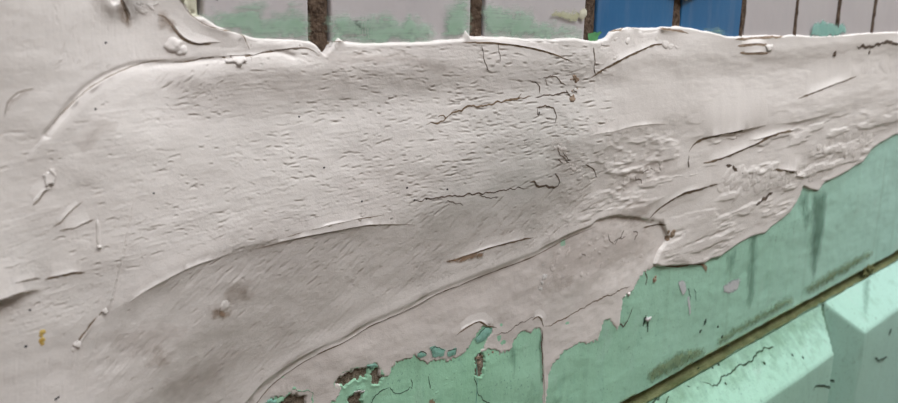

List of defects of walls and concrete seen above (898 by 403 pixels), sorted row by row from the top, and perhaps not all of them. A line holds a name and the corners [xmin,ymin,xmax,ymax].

crack [430,75,567,124]
peeling [644,89,805,228]
peeling [251,205,410,250]
peeling [665,250,705,268]
peeling [246,219,594,403]
crack [652,346,773,403]